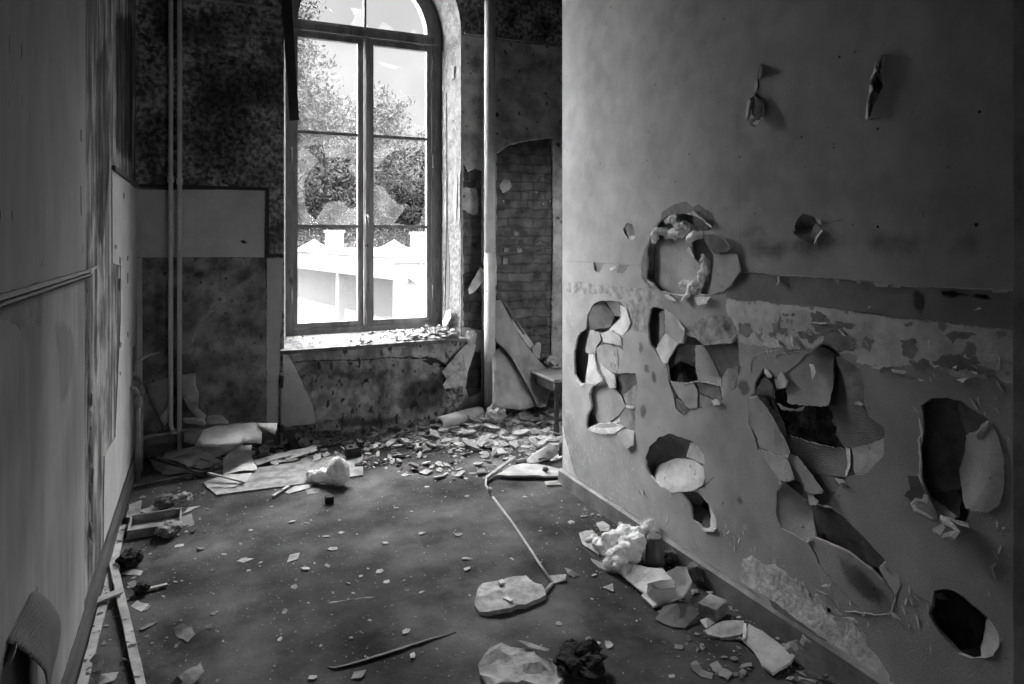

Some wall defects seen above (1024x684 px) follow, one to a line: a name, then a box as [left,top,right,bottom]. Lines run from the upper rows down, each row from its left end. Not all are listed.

flaking render [745,64,764,127]
flaking render [865,55,884,120]
flaking render [420,356,448,368]
spalling [496,137,1013,681]